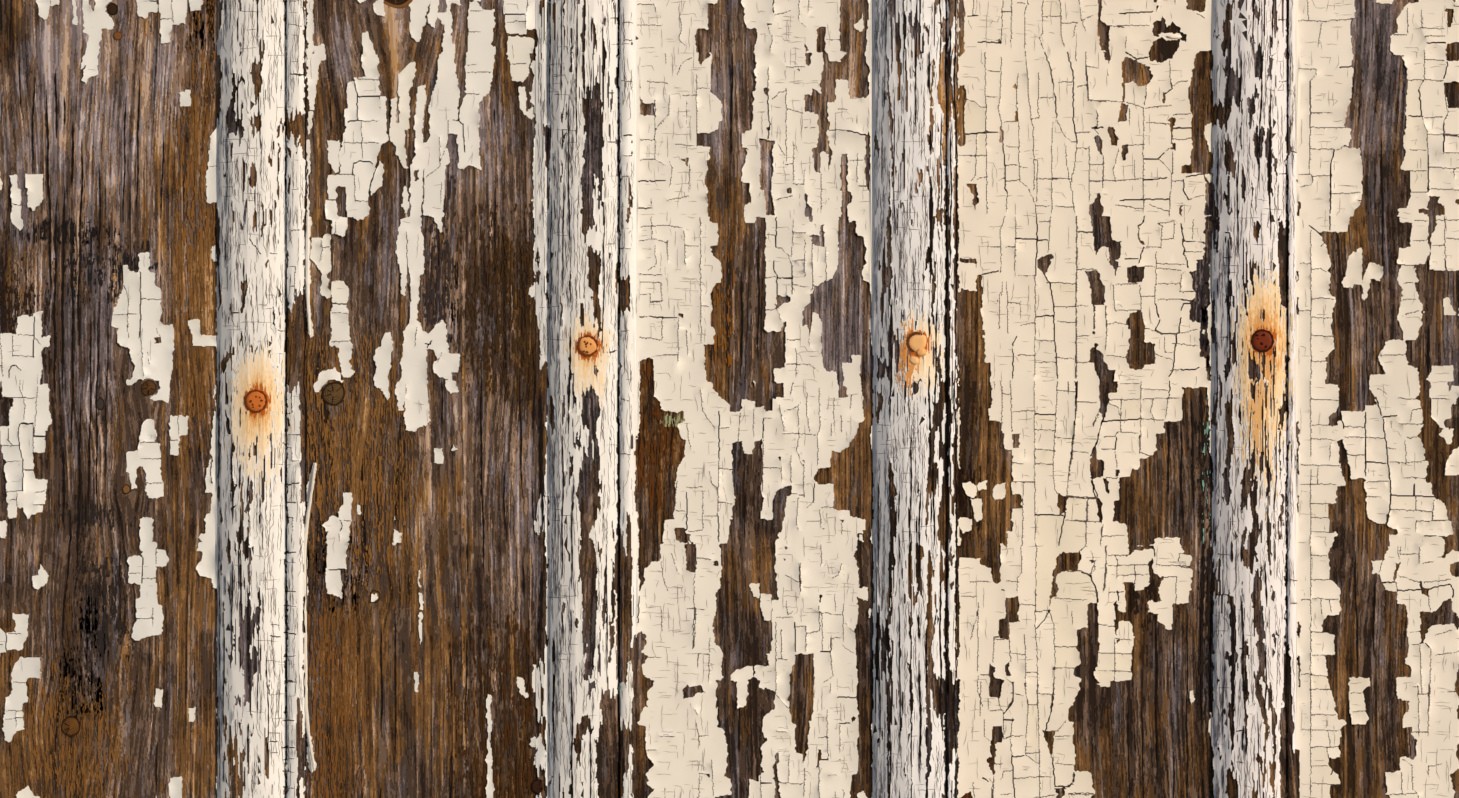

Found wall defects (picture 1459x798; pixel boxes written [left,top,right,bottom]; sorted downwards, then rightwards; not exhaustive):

corrosion [222,338,294,505]
peeling [0,0,822,798]
crack [399,330,442,420]
corrosion [564,310,617,411]
corrosion [887,310,951,411]
crack [406,0,1459,798]
peeling [681,0,1459,798]
corrosion [1231,249,1295,523]